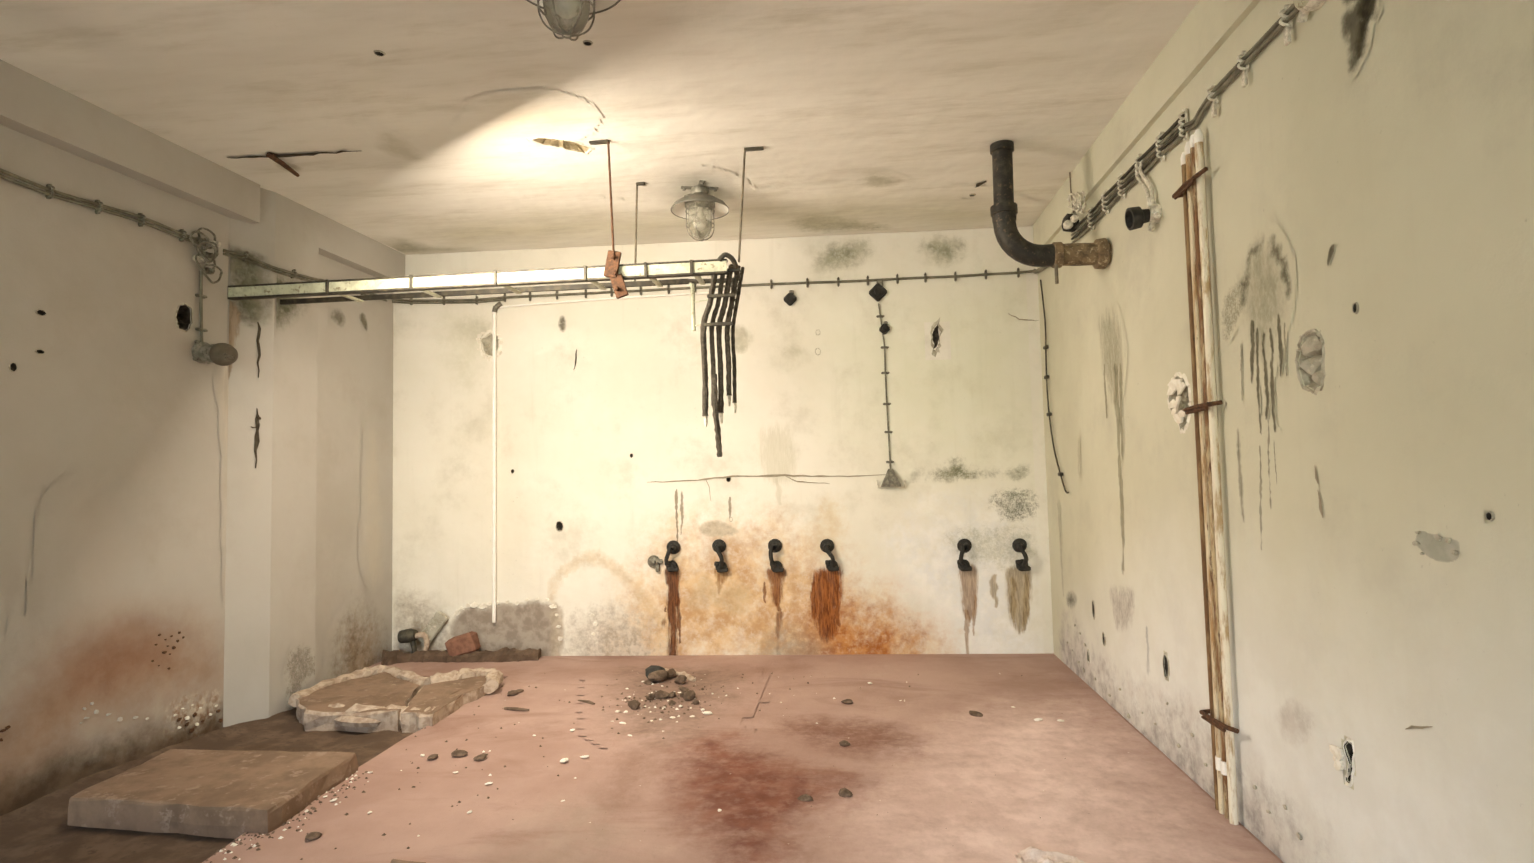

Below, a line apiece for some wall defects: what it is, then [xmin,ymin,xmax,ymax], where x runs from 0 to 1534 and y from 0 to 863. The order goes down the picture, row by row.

leakage [1338,0,1382,81]
crack [251,322,261,468]
leakage [722,318,748,356]
spalling [1167,372,1192,434]
spalling [1295,329,1325,395]
corrosion [588,479,1035,655]
leakage [794,299,1208,685]
leakage [1218,221,1534,863]
corrosion [0,566,224,747]
leakage [419,568,1281,863]
spalling [1053,591,1215,800]
spalling [1233,707,1355,863]